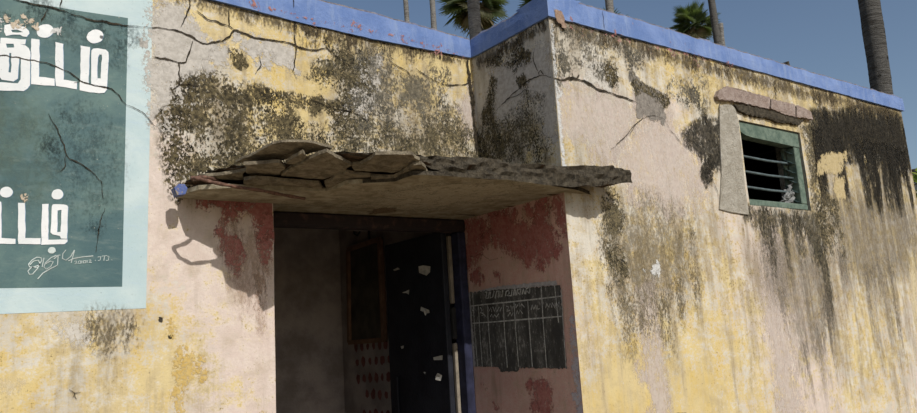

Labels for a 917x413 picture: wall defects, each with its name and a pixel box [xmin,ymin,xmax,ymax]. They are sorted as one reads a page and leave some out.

peeling [0,14,39,32]
crack [380,55,474,86]
water stain [155,19,710,205]
peeling [458,81,476,141]
crack [491,38,686,147]
peeling [488,8,721,219]
spalling [171,140,428,279]
peeling [464,194,567,286]
water stain [601,186,701,353]
water stain [743,87,914,347]
peeling [525,378,553,413]